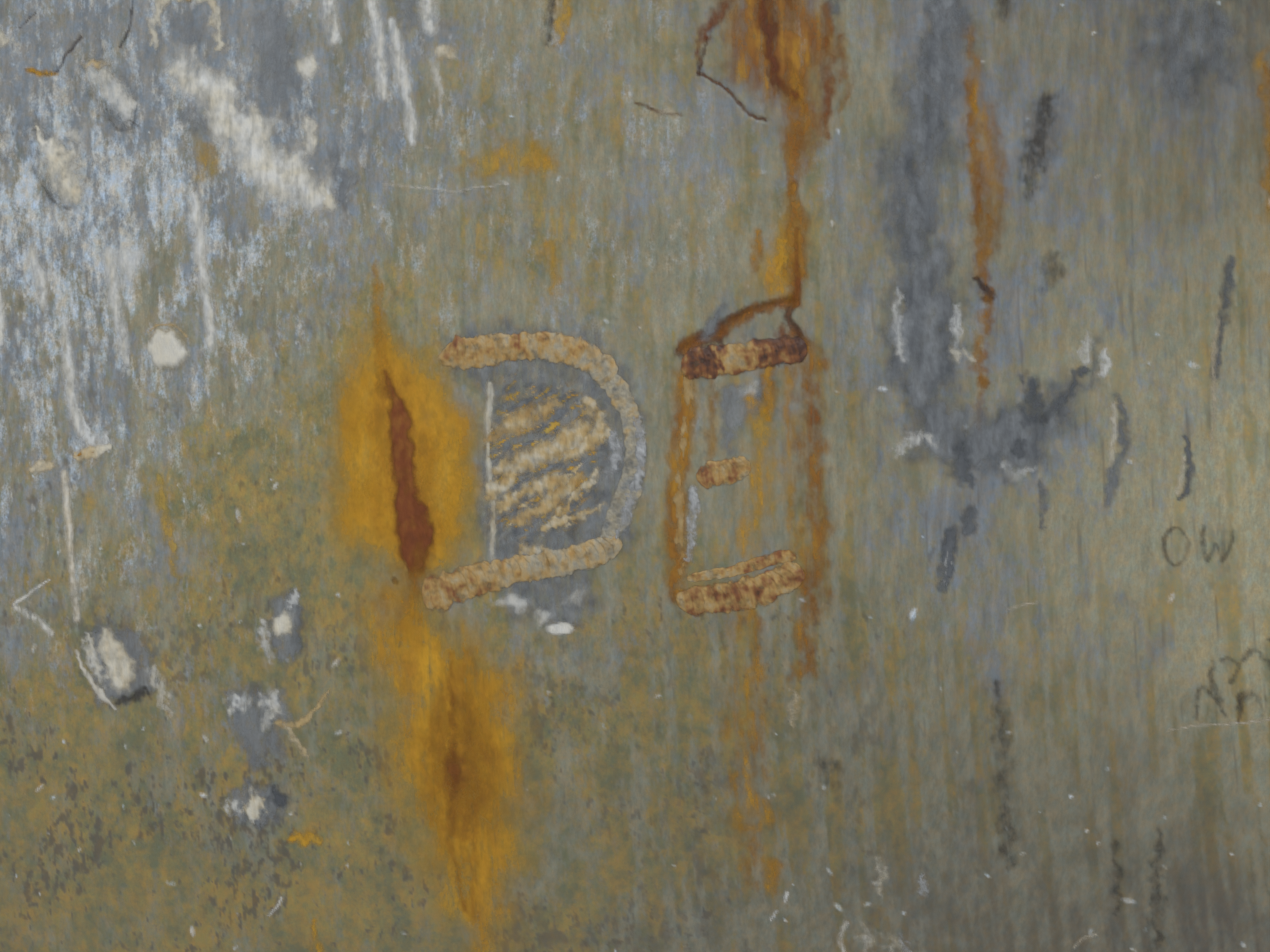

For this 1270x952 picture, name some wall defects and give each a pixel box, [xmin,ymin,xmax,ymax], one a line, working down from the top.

rust [697,0,842,306]
rust [966,84,994,384]
peeling [76,627,170,710]
peeling [259,591,303,661]
rust [334,283,521,952]
rust [665,372,695,600]
rust [746,365,789,505]
rust [788,339,827,493]
rust [800,512,829,613]
peeling [225,687,329,828]